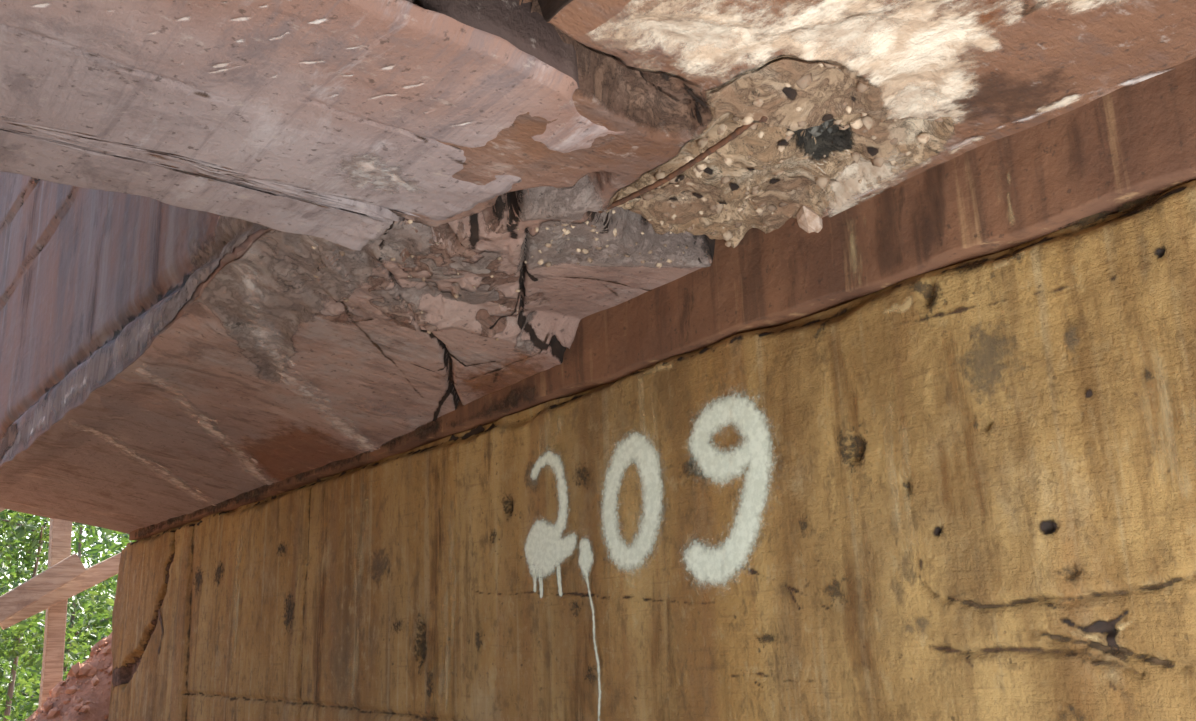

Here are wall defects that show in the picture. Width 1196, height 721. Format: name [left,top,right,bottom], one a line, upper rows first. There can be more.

water stain [1021,95,1078,121]
water stain [1122,71,1167,85]
spalling [263,0,1000,354]
spalling [0,262,207,459]
crack [334,185,652,421]
spalling [615,347,715,382]
spalling [890,187,1186,320]
spalling [339,424,496,477]
crack [112,552,175,688]
crack [919,560,1184,690]